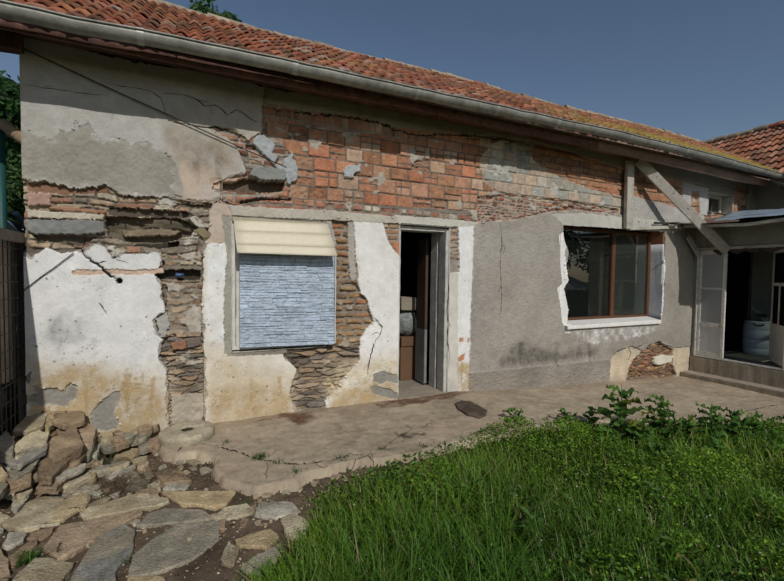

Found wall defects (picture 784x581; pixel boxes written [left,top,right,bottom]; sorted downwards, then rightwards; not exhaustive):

crack [22,83,496,140]
flaking render [663,177,750,219]
crack [67,239,129,279]
flaking render [21,120,214,425]
flaking render [212,105,691,410]
crack [498,204,614,314]
crack [364,317,383,369]
flaking render [91,386,122,432]
crack [178,423,430,478]